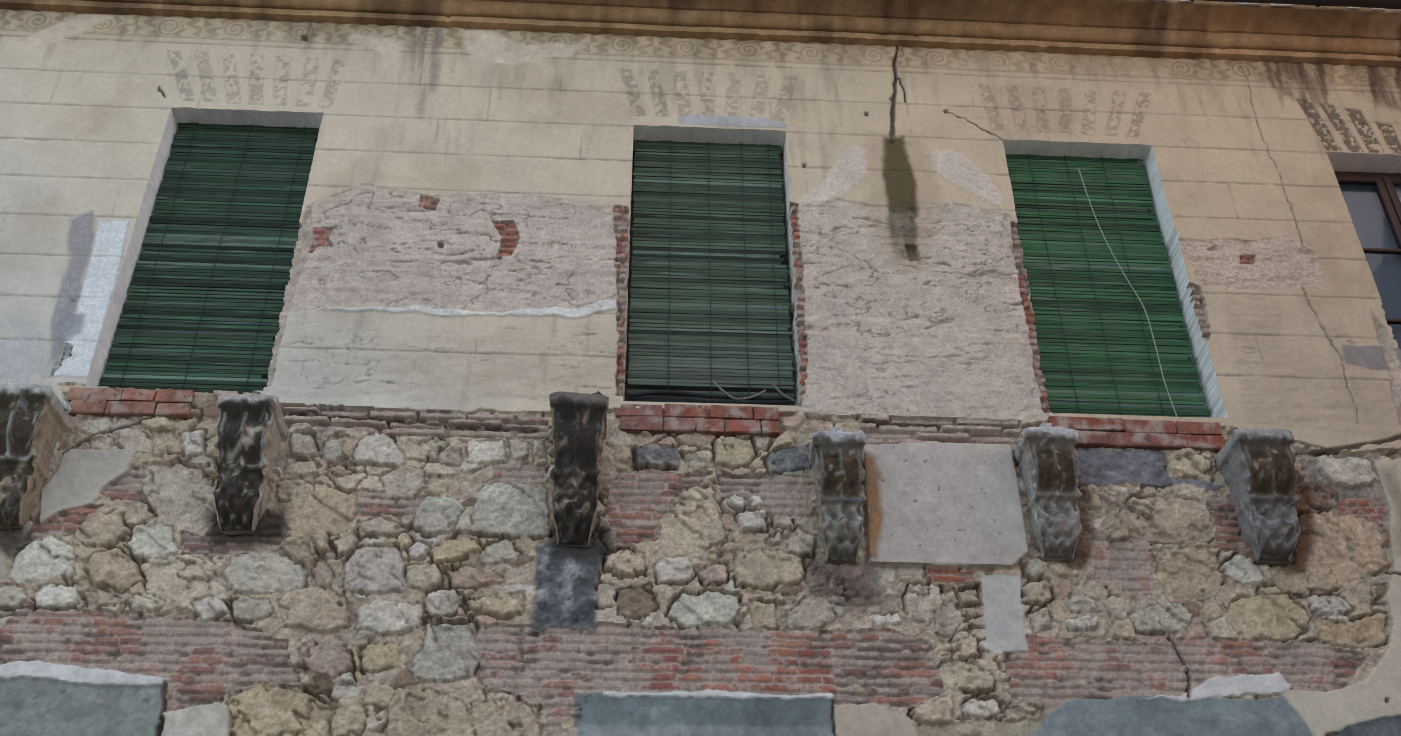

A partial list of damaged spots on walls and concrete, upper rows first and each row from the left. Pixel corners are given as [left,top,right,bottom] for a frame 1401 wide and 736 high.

crack [890,47,907,141]
leakage [884,138,919,257]
crack [943,110,1003,140]
crack [1240,65,1305,248]
leakage [1369,65,1401,105]
peeling [267,183,630,397]
peeling [790,146,1059,422]
peeling [1179,236,1325,341]
crack [1294,287,1401,457]